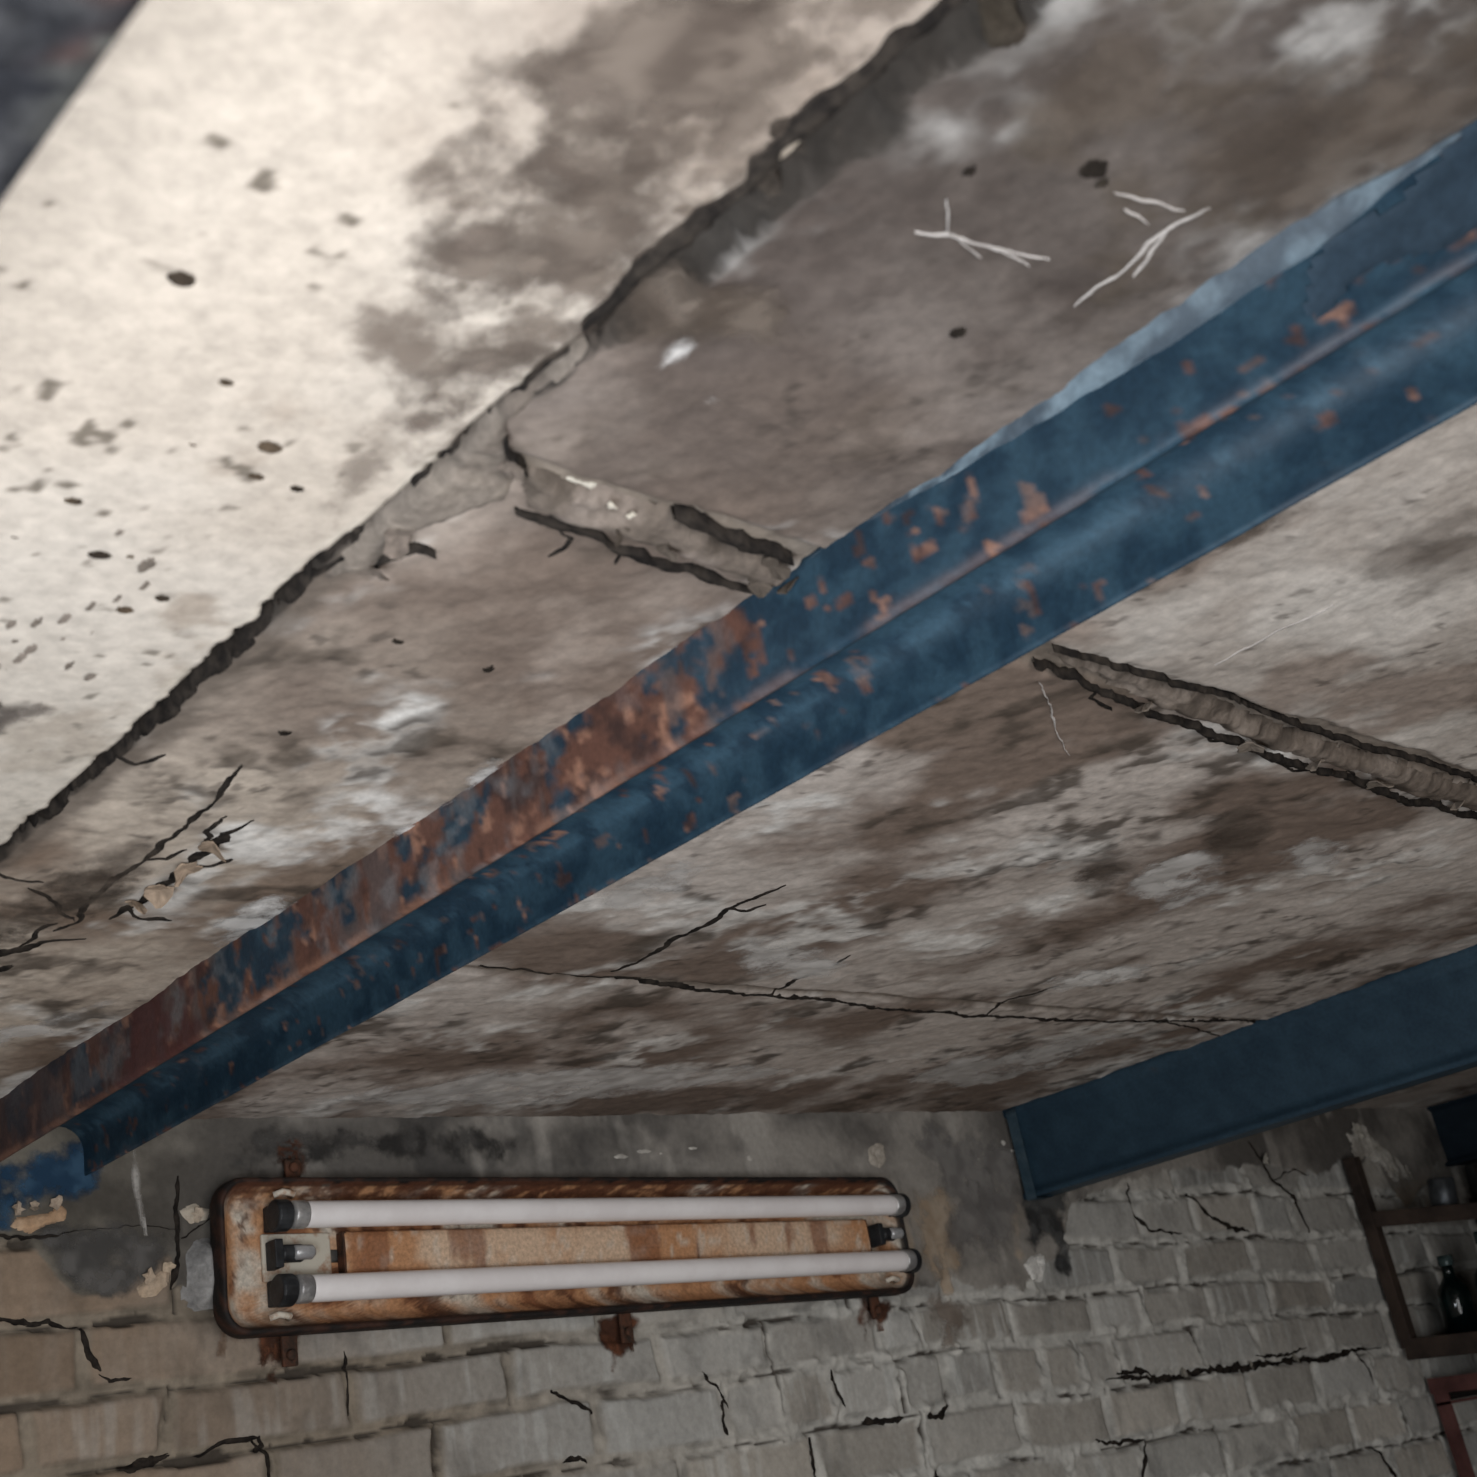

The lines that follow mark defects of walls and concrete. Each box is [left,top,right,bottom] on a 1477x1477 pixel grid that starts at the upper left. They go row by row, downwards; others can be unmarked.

damp [362,0,910,430]
crack [514,504,794,594]
crack [0,344,570,972]
crack [1031,643,1477,820]
damp [1081,810,1270,909]
damp [215,897,284,940]
crack [480,885,1256,1037]
damp [343,1065,790,1104]
flaking render [0,1195,77,1241]
rust [598,1315,638,1357]
rust [858,1298,891,1332]
crack [194,1435,270,1477]